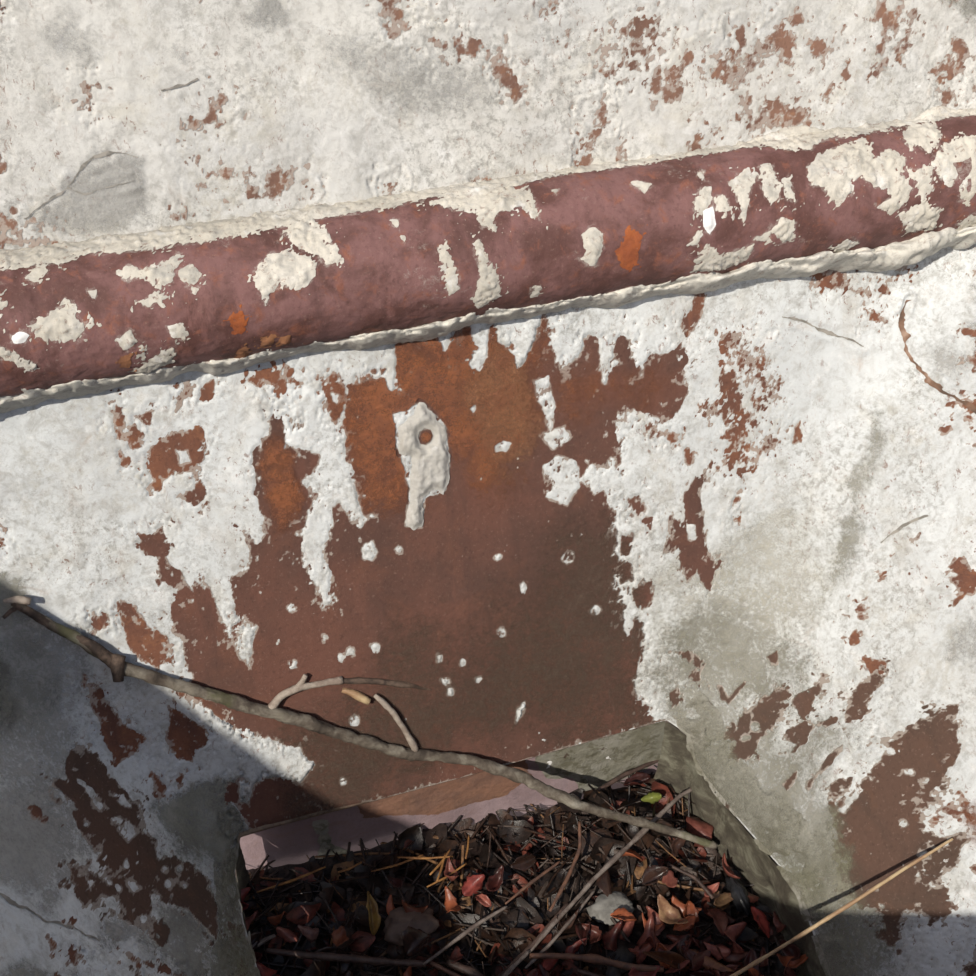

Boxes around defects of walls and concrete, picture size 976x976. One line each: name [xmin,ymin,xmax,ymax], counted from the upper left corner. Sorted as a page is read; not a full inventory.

corrosion [411,25,530,106]
corrosion [593,1,851,152]
corrosion [863,0,926,88]
corrosion [928,26,976,107]
peeling [686,224,703,254]
peeling [828,239,859,253]
corrosion [809,263,926,333]
crack [898,300,976,414]
corrosion [27,293,976,976]
leakage [0,572,92,913]
leakage [152,779,244,871]
leakage [98,896,236,976]